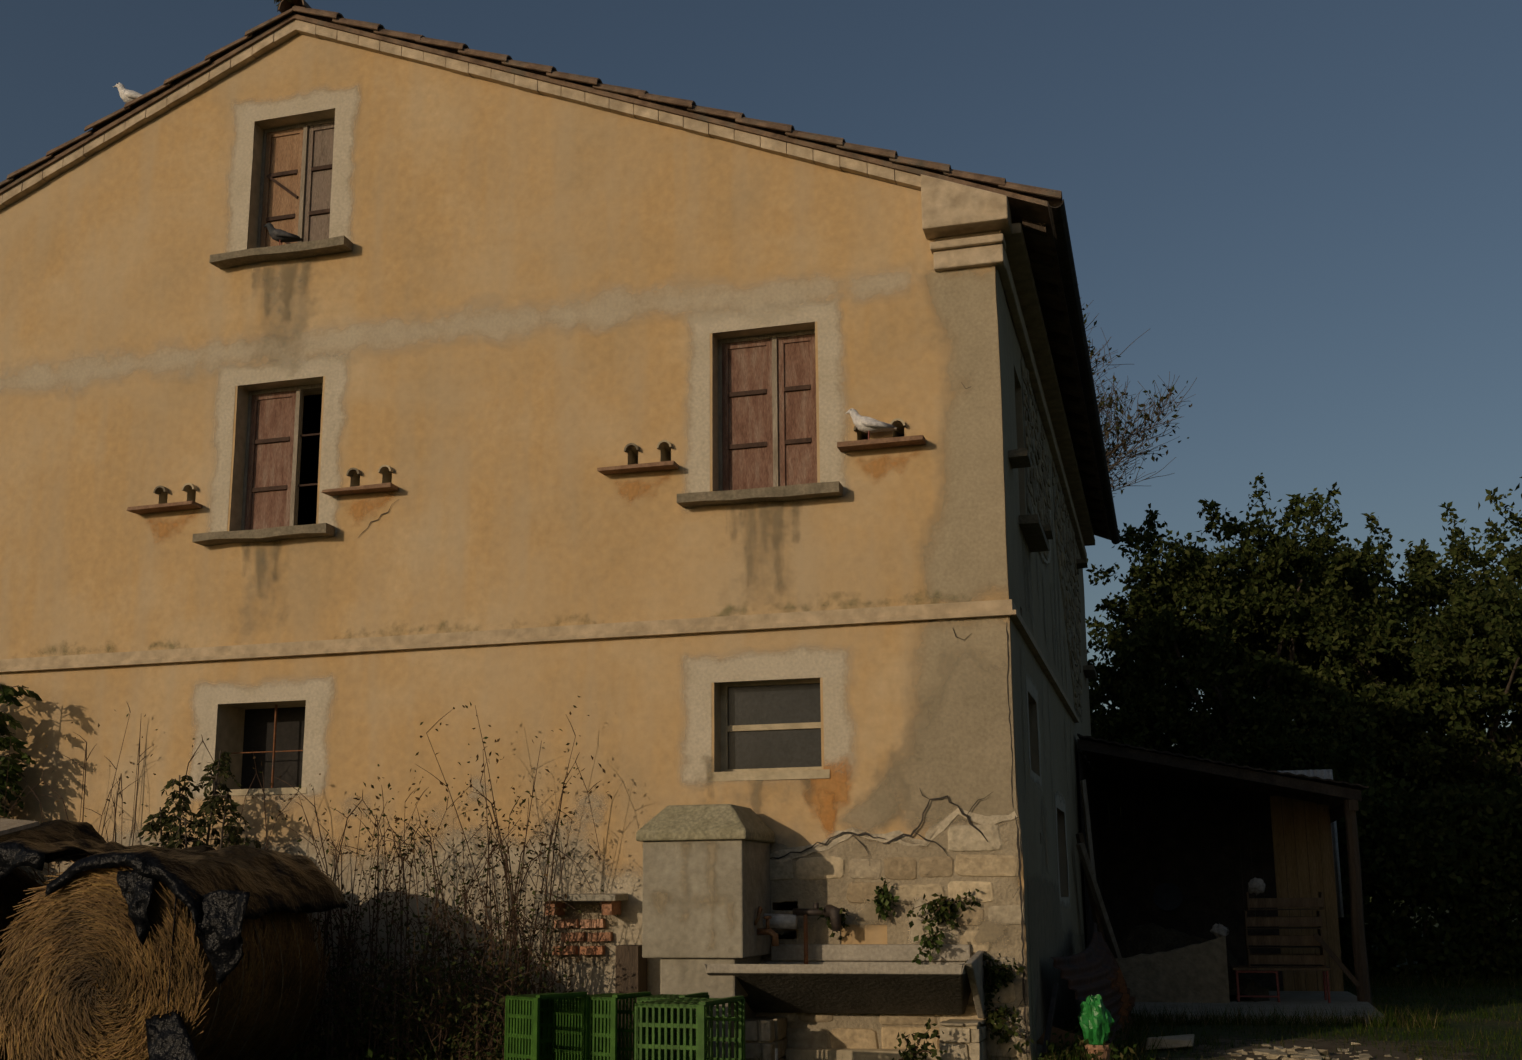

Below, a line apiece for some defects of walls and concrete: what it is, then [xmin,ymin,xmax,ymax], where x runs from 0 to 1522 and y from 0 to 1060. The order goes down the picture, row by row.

flaking render [913,270,1012,738]
peeling [263,824,661,1037]
spalling [755,807,1029,1060]
crack [770,623,1028,1059]